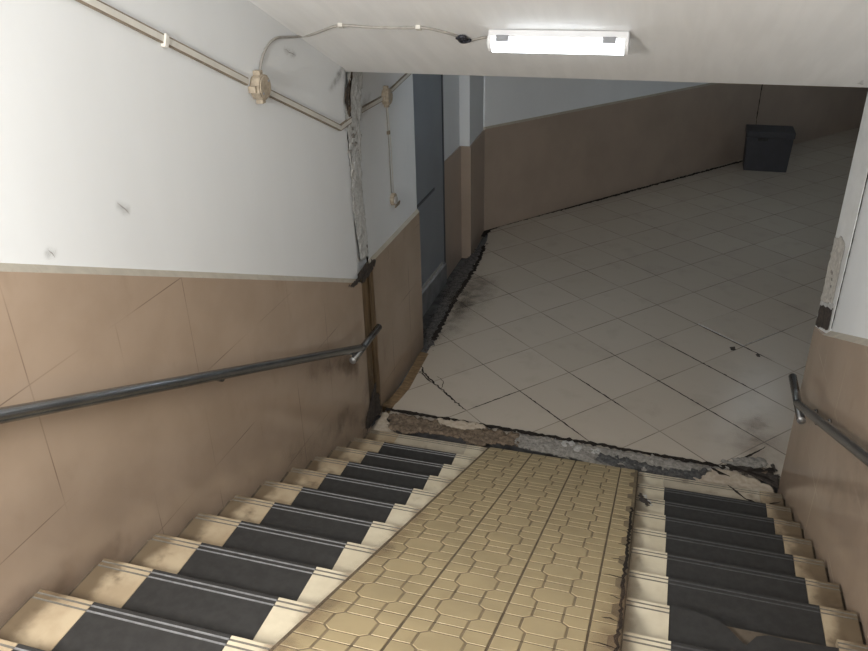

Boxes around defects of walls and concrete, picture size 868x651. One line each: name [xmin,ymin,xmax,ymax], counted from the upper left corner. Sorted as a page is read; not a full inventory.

flaking render [345,72,353,117]